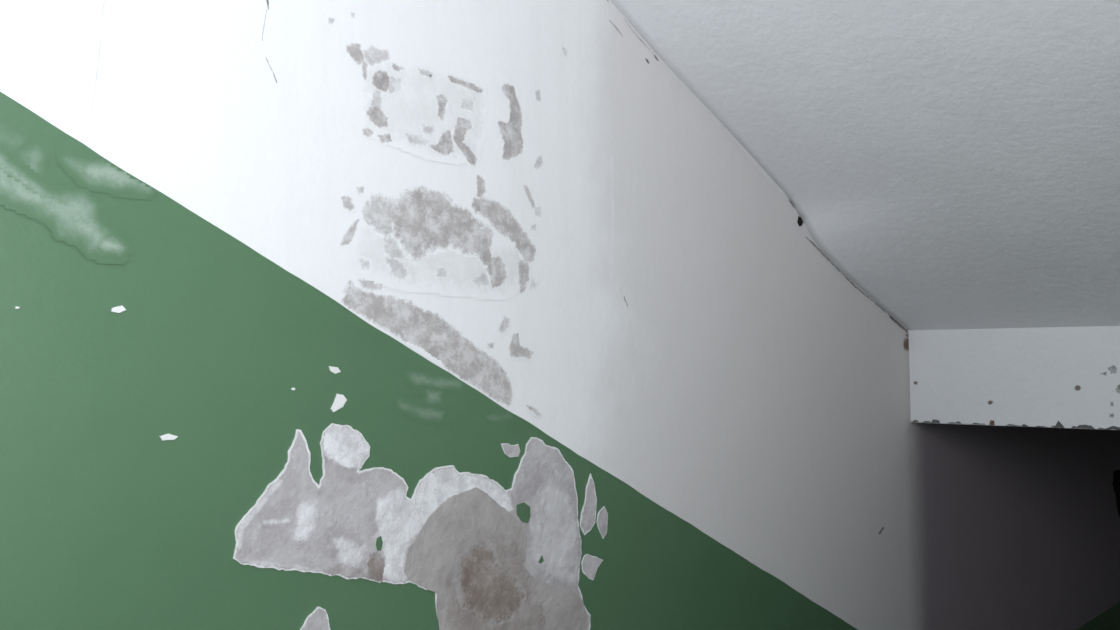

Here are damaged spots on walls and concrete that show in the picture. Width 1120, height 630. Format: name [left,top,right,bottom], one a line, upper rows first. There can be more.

peeling [345,40,544,172]
leakage [0,115,158,265]
peeling [521,182,542,233]
peeling [339,275,545,419]
spalling [913,364,1120,430]
peeling [233,394,608,630]